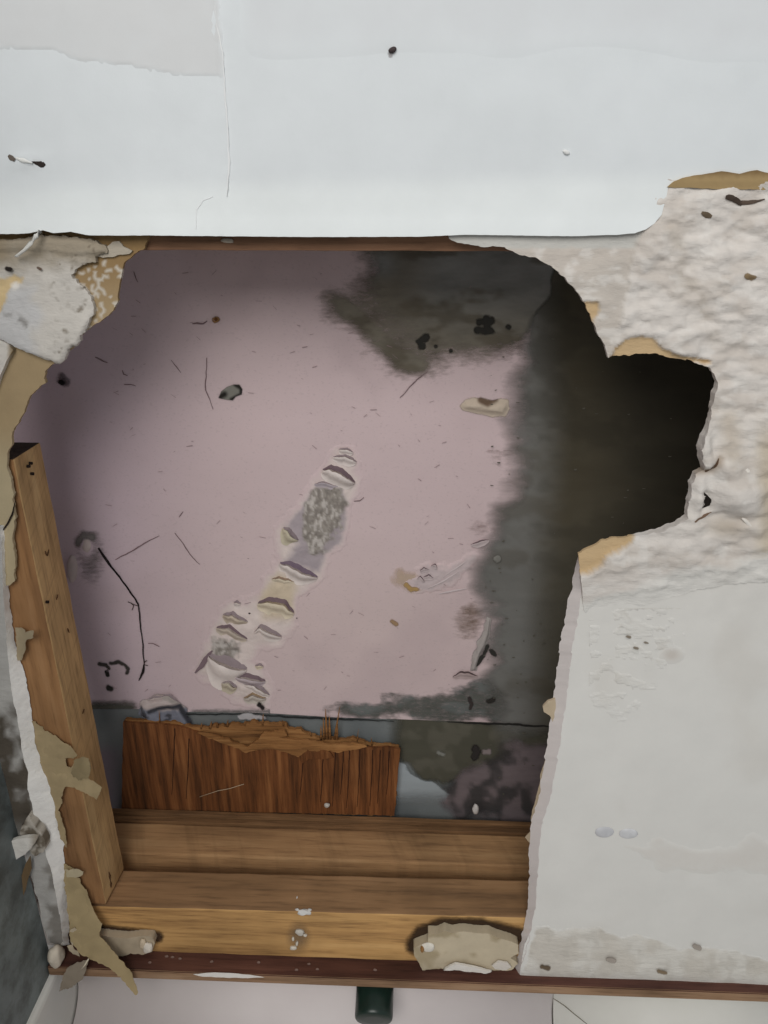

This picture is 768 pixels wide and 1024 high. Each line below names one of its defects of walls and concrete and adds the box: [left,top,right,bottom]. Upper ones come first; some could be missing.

flaking render [0,234,133,383]
flaking render [449,179,768,613]
crack [98,512,199,681]
peeling [453,617,497,679]
damp [324,251,715,822]
flaking render [12,834,39,860]